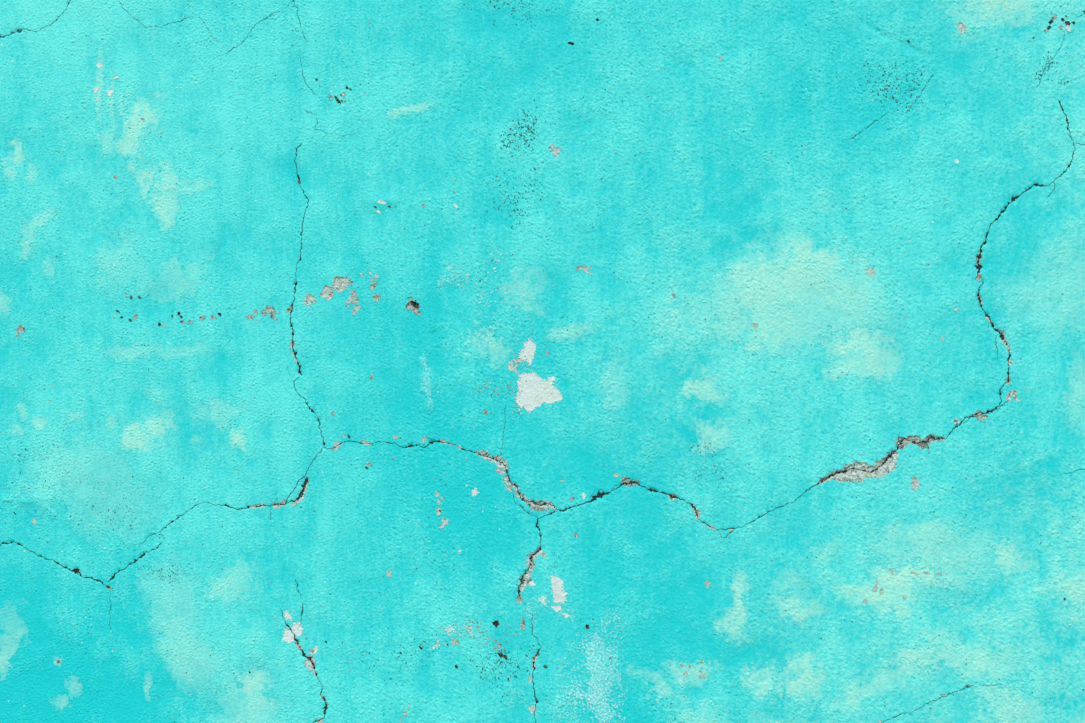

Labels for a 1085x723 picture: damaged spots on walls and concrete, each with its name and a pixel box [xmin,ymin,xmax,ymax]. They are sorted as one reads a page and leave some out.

flaking render [302,271,380,315]
peeling [507,338,563,415]
crack [0,100,1085,628]
crack [279,579,327,723]
crack [527,612,541,722]
crack [878,684,1002,723]